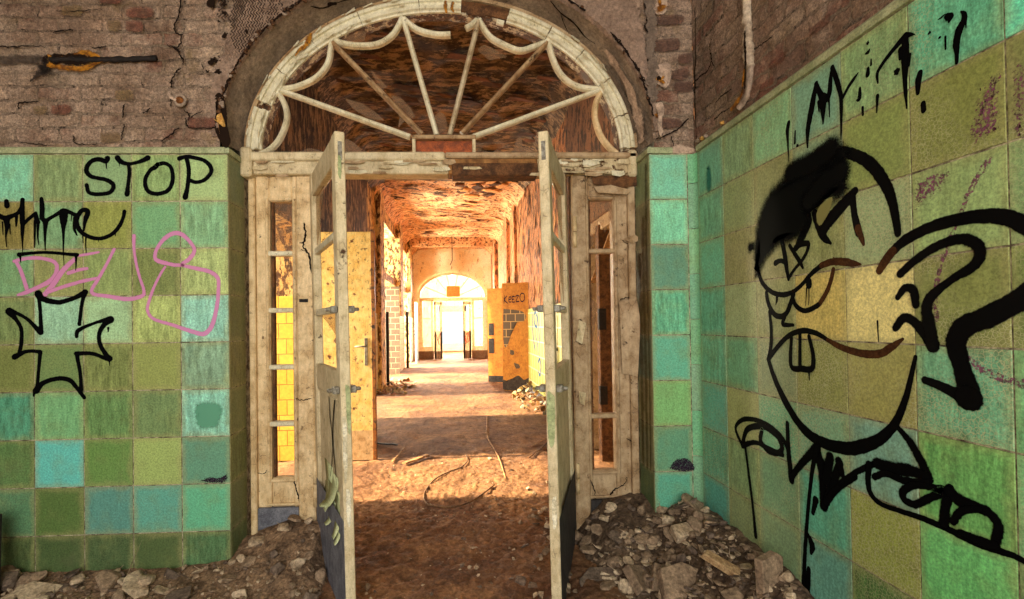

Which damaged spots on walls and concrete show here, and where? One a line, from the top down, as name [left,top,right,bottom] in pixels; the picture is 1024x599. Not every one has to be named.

crack [0,9,102,48]
crack [550,0,595,44]
crack [25,0,215,146]
flaking render [188,0,307,148]
crack [656,10,731,146]
flaking render [246,0,693,302]
crack [301,223,312,274]
peeling [576,320,586,344]
peeling [619,297,640,376]